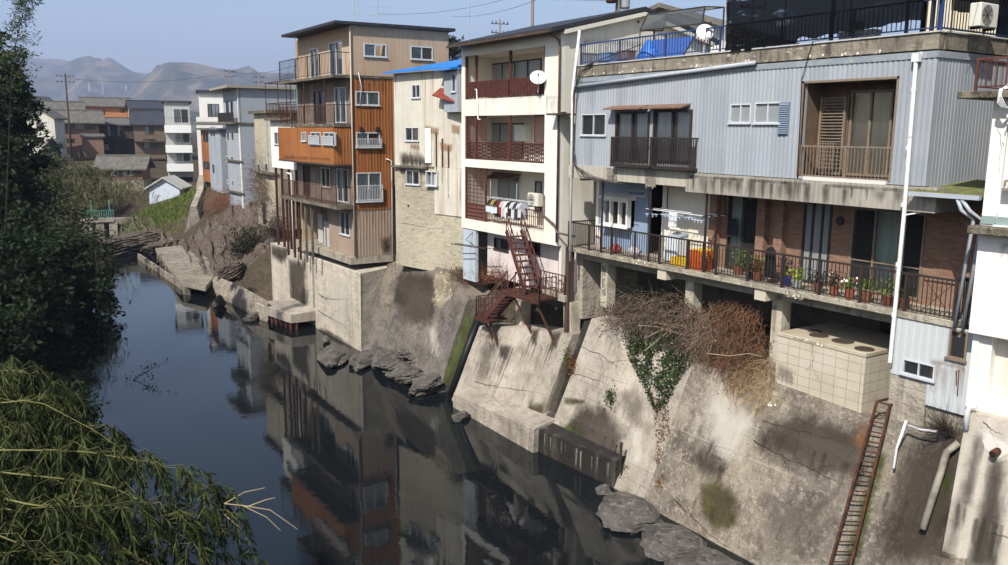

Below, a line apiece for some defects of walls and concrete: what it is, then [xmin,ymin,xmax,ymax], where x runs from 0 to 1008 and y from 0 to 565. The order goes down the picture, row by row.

leakage [394,273,435,320]
leakage [761,418,863,484]